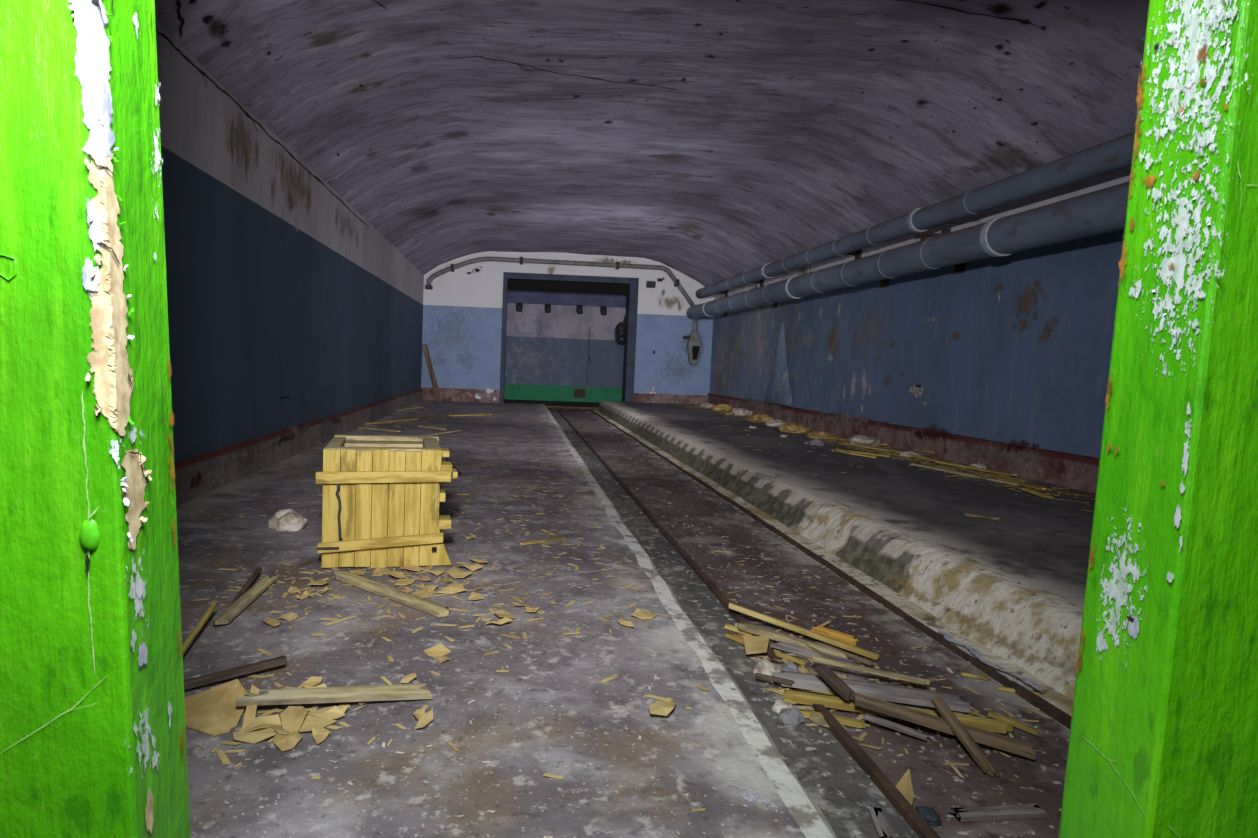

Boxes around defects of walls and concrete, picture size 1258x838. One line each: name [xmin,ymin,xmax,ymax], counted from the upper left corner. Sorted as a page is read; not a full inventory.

peeling [152,127,163,220]
crack [156,0,367,226]
crack [445,56,678,90]
crack [897,0,1037,26]
peeling [1129,0,1253,377]
flaking render [68,0,152,667]
peeling [1096,508,1149,664]